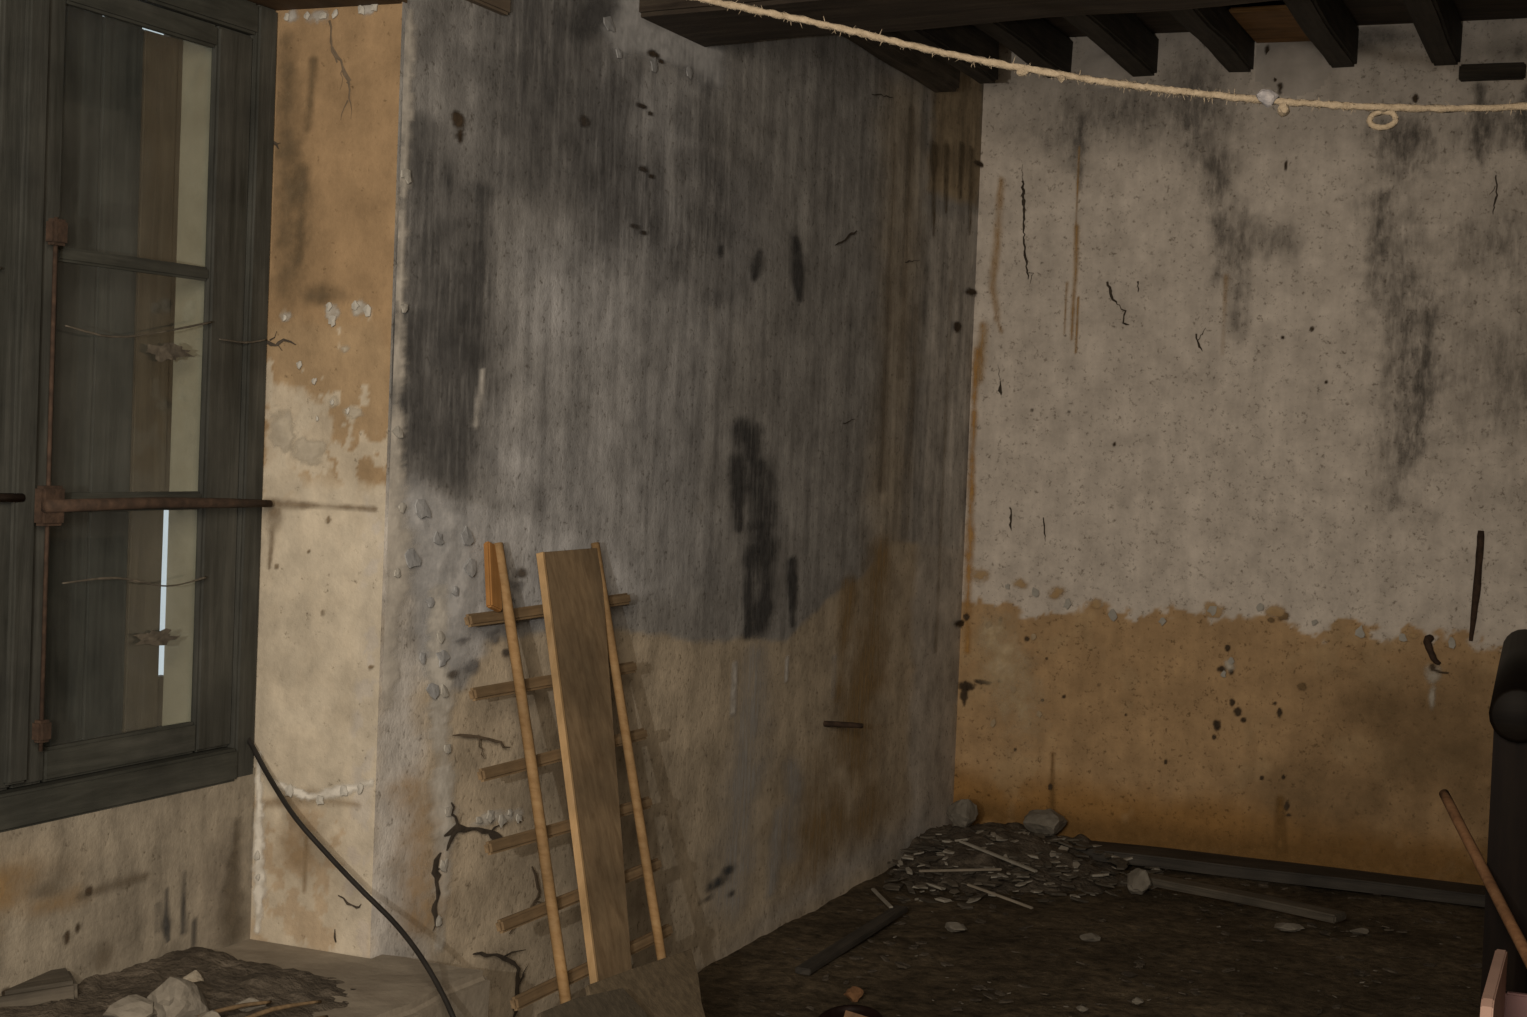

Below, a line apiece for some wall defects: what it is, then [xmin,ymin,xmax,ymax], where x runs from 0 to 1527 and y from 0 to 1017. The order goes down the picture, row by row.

crack [328,20,352,117]
leakage [931,143,973,235]
peeling [326,300,371,327]
leakage [732,458,744,532]
leakage [743,547,755,638]
leakage [788,558,797,627]
peeling [1256,603,1289,622]
spalling [959,680,1000,705]
spalling [1217,645,1235,677]
spalling [1212,699,1246,739]
crack [431,802,502,931]
crack [473,866,541,1017]